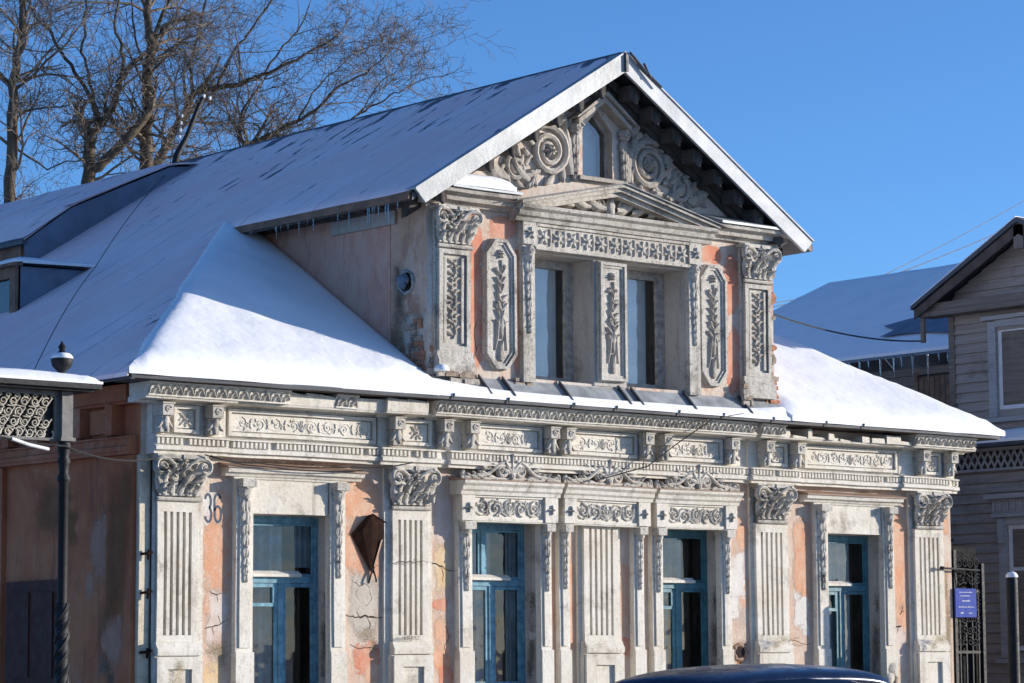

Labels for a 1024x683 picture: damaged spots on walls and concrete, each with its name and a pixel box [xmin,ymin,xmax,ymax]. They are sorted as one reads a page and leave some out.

spalling [400,214,534,386]
peeling [202,657,228,683]
peeling [202,489,233,645]
crack [346,580,382,653]
crack [393,558,453,576]
peeling [792,515,813,636]